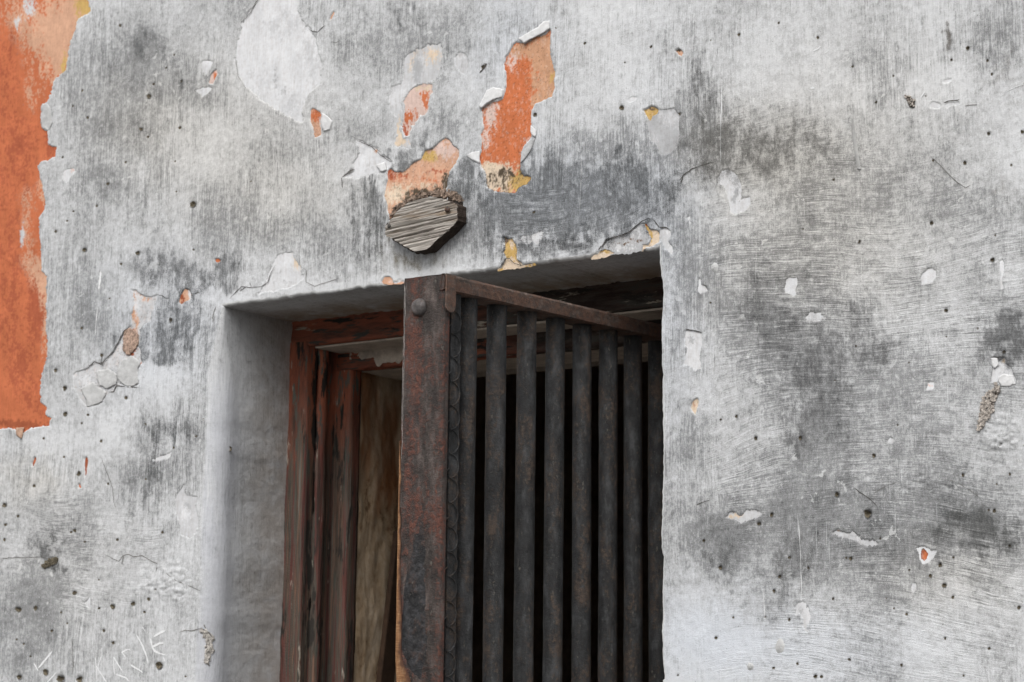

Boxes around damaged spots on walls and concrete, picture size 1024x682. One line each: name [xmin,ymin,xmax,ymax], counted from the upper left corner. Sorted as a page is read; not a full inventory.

peeling [235,0,332,137]
peeling [345,21,557,219]
spalling [718,170,751,214]
peeling [0,0,91,440]
peeling [498,230,544,271]
peeling [591,249,614,260]
crack [88,327,129,368]
flaking render [976,350,1016,431]
peeling [726,509,773,525]
peeling [833,529,881,546]
peeling [916,547,954,578]
rust [402,513,427,679]